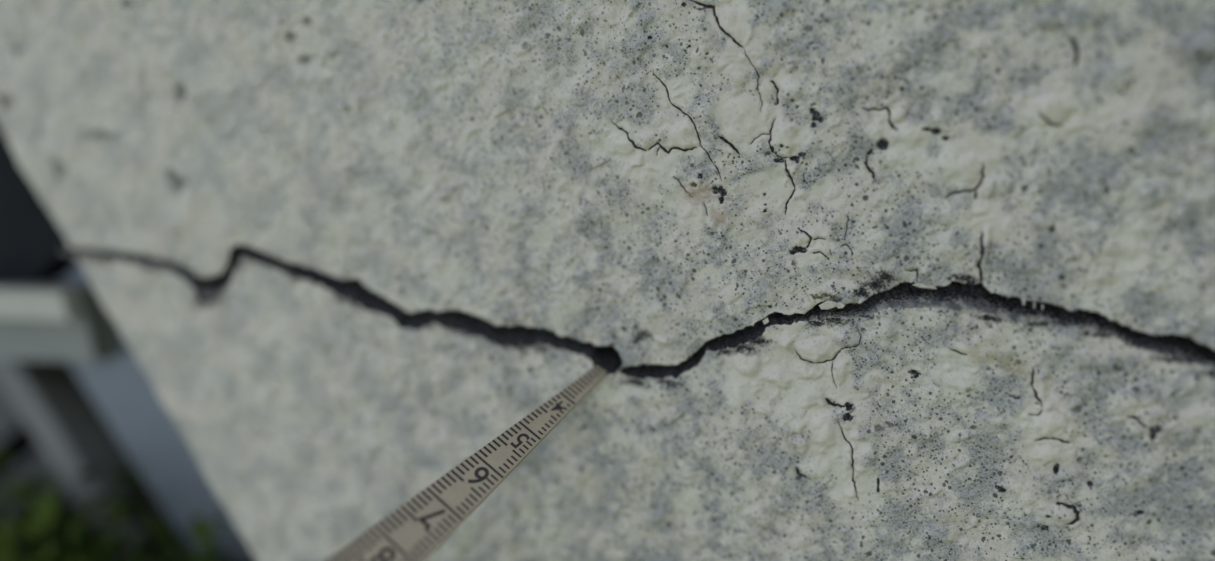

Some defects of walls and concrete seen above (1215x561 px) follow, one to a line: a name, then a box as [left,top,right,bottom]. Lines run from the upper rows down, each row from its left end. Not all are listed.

crack [1070,37,1080,66]
crack [614,0,804,215]
crack [863,106,898,131]
crack [1039,113,1063,126]
crack [865,149,875,180]
crack [946,164,985,199]
crack [58,218,1215,498]